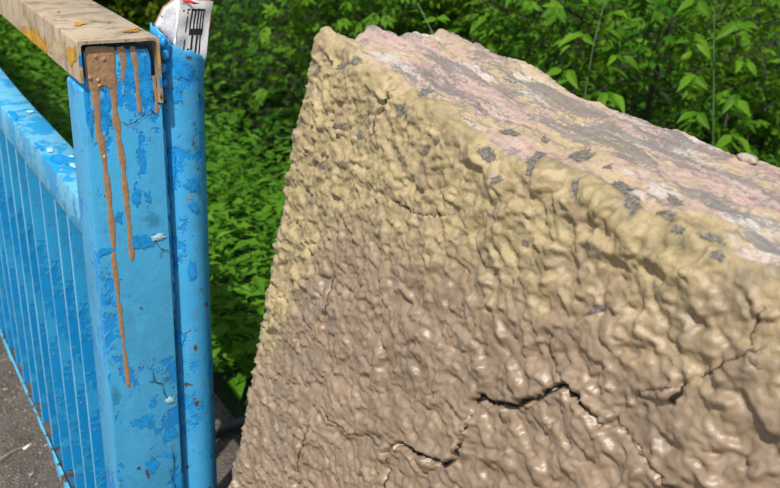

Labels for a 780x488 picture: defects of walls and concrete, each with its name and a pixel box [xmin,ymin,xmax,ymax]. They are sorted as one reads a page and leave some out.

peeling [19,16,112,141]
peeling [35,143,76,168]
peeling [132,186,151,207]
peeling [128,233,166,250]
peeling [175,332,187,346]
crack [636,309,765,403]
peeling [130,396,174,429]
crack [296,335,669,488]